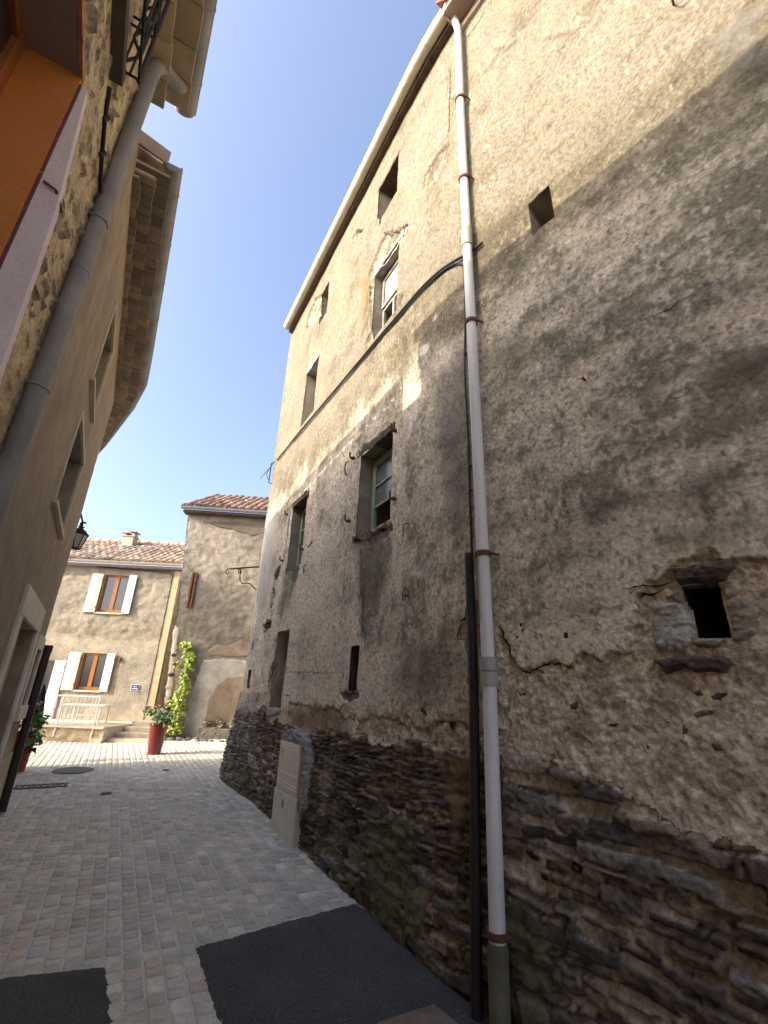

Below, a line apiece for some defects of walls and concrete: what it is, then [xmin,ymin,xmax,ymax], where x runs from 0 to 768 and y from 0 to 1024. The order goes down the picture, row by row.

crack [498,625,576,673]
flaking render [287,691,483,753]
flaking render [499,550,768,855]